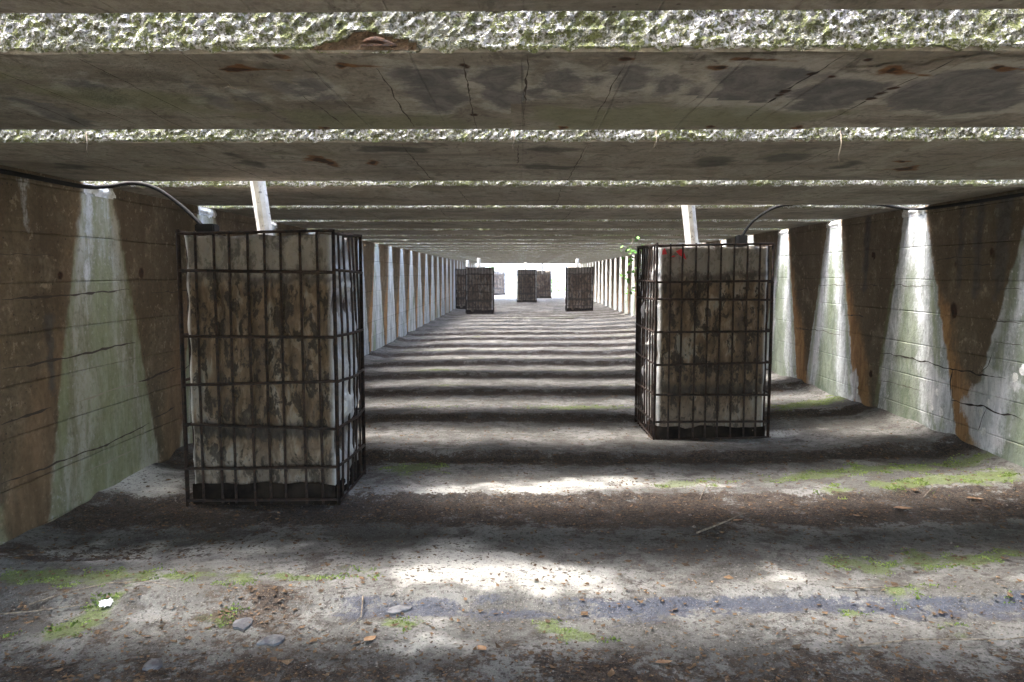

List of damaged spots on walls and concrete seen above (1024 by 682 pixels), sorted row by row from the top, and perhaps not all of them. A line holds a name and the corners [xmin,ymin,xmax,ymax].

spalling [310,31,417,50]
crack [377,69,414,126]
crack [454,59,481,128]
crack [517,56,529,162]
leakage [207,54,1024,122]
leakage [194,206,220,235]
leakage [9,162,155,525]
leakage [176,319,193,449]
corrosion [789,228,816,386]
corrosion [843,220,878,408]
crack [878,352,1022,430]
corrosion [928,206,974,402]